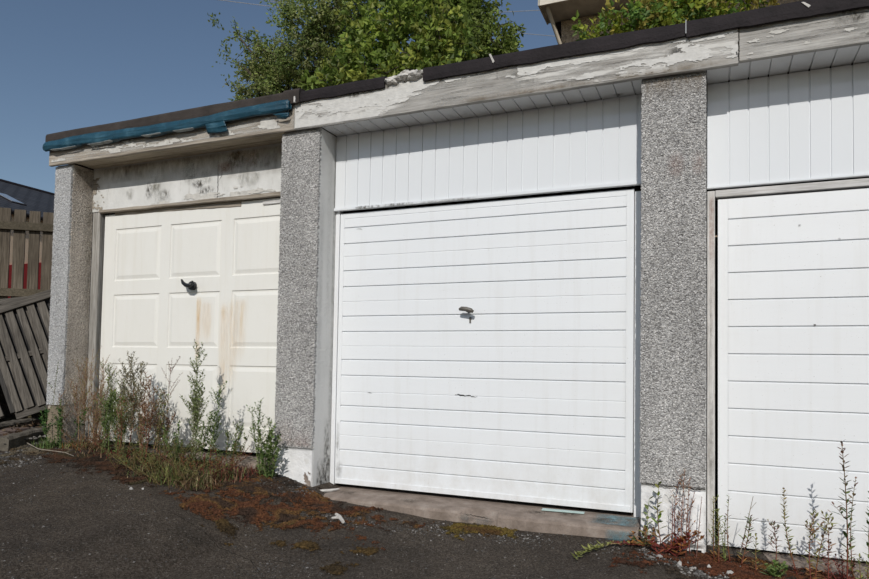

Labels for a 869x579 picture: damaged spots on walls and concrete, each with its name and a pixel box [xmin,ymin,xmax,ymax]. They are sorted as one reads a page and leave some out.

peeling [295,27,869,128]
peeling [51,116,280,162]